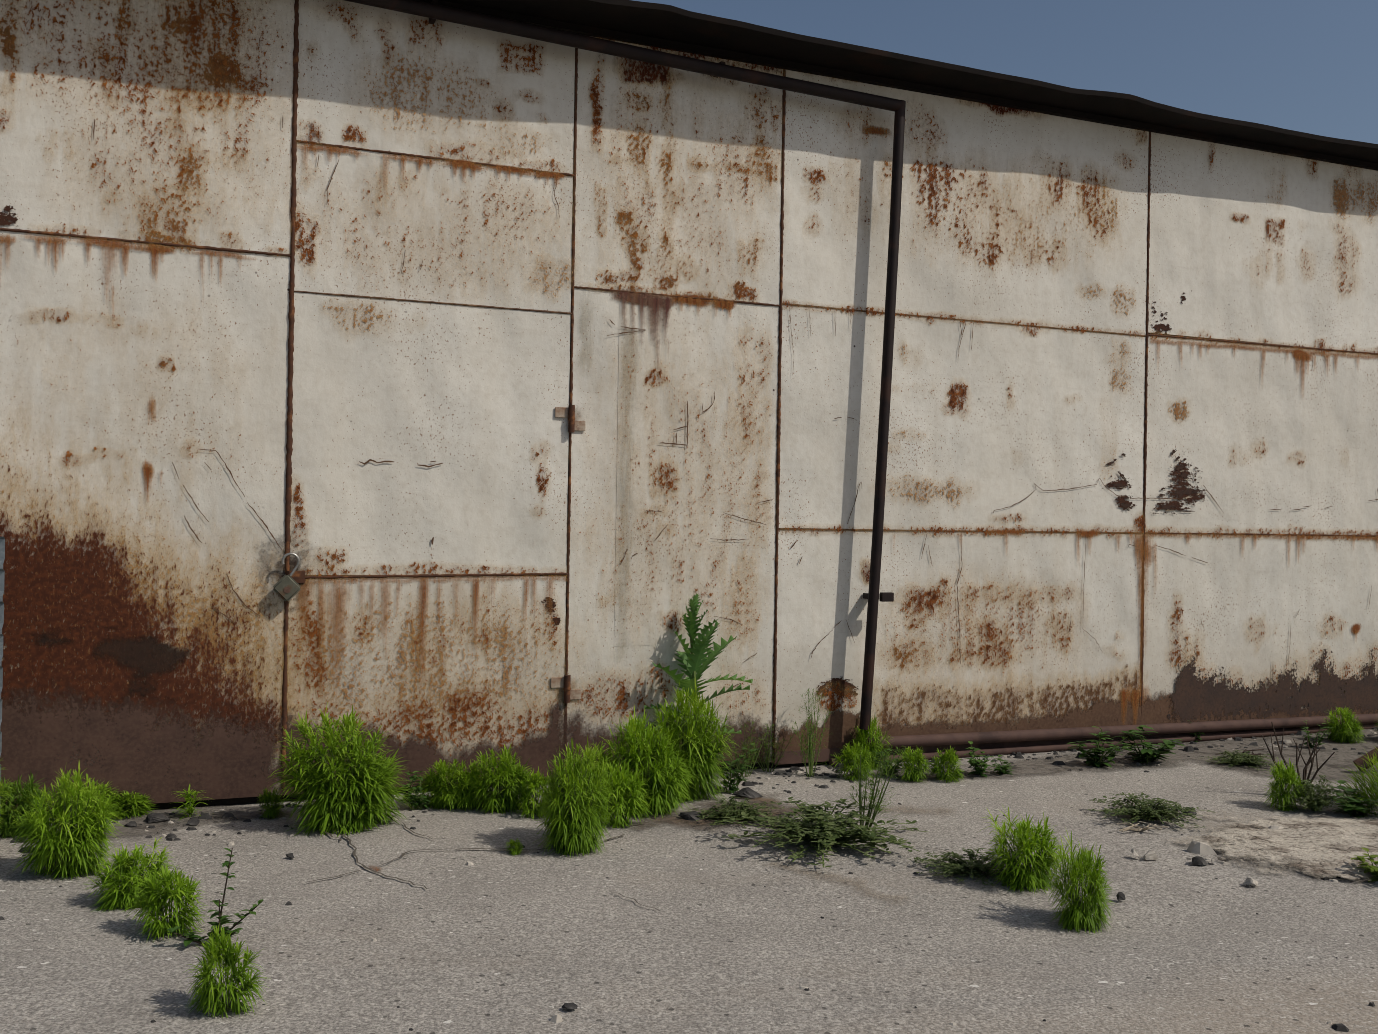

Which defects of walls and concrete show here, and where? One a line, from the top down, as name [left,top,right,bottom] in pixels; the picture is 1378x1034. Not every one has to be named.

rust [0,0,573,335]
rust [804,168,826,229]
rust [836,104,1139,272]
rust [1252,219,1285,281]
rust [1331,166,1378,294]
rust [579,38,783,641]
rust [783,284,1378,390]
rust [1168,401,1190,422]
peeling [1102,449,1207,515]
rust [0,444,1378,813]
crack [309,822,564,889]